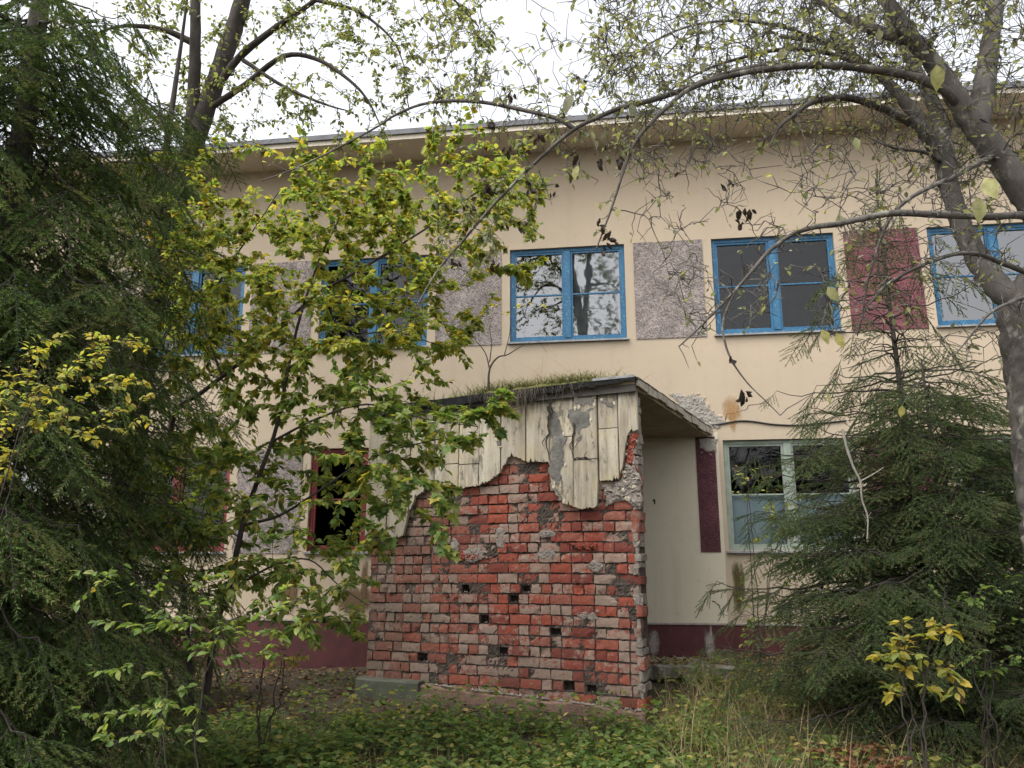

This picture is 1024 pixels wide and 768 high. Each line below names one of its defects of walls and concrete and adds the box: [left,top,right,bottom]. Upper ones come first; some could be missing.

peeling [546,397,615,504]
flaking render [669,392,730,455]
spalling [601,397,652,710]
hole [509,585,530,603]
hole [564,681,597,692]